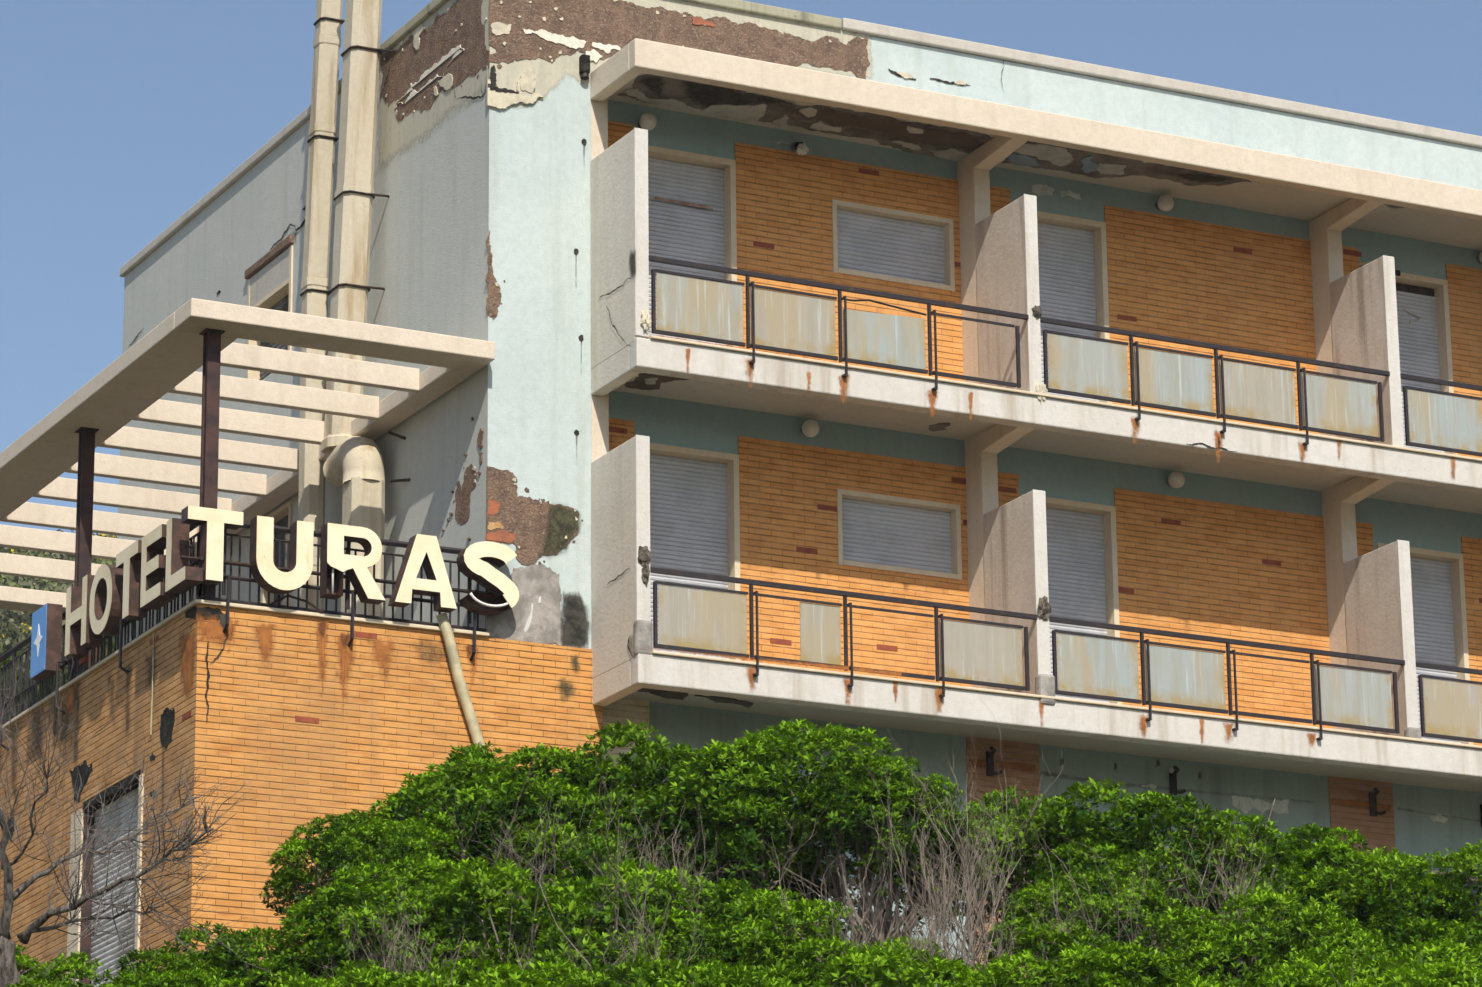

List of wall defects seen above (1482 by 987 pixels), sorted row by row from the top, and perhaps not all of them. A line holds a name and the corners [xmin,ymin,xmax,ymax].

flaking render [378,0,872,166]
peeling [618,74,992,162]
peeling [1002,141,1251,200]
flaking render [485,231,505,320]
crack [599,277,633,346]
corrosion [658,335,849,400]
corrosion [928,390,937,414]
flaking render [441,417,583,646]